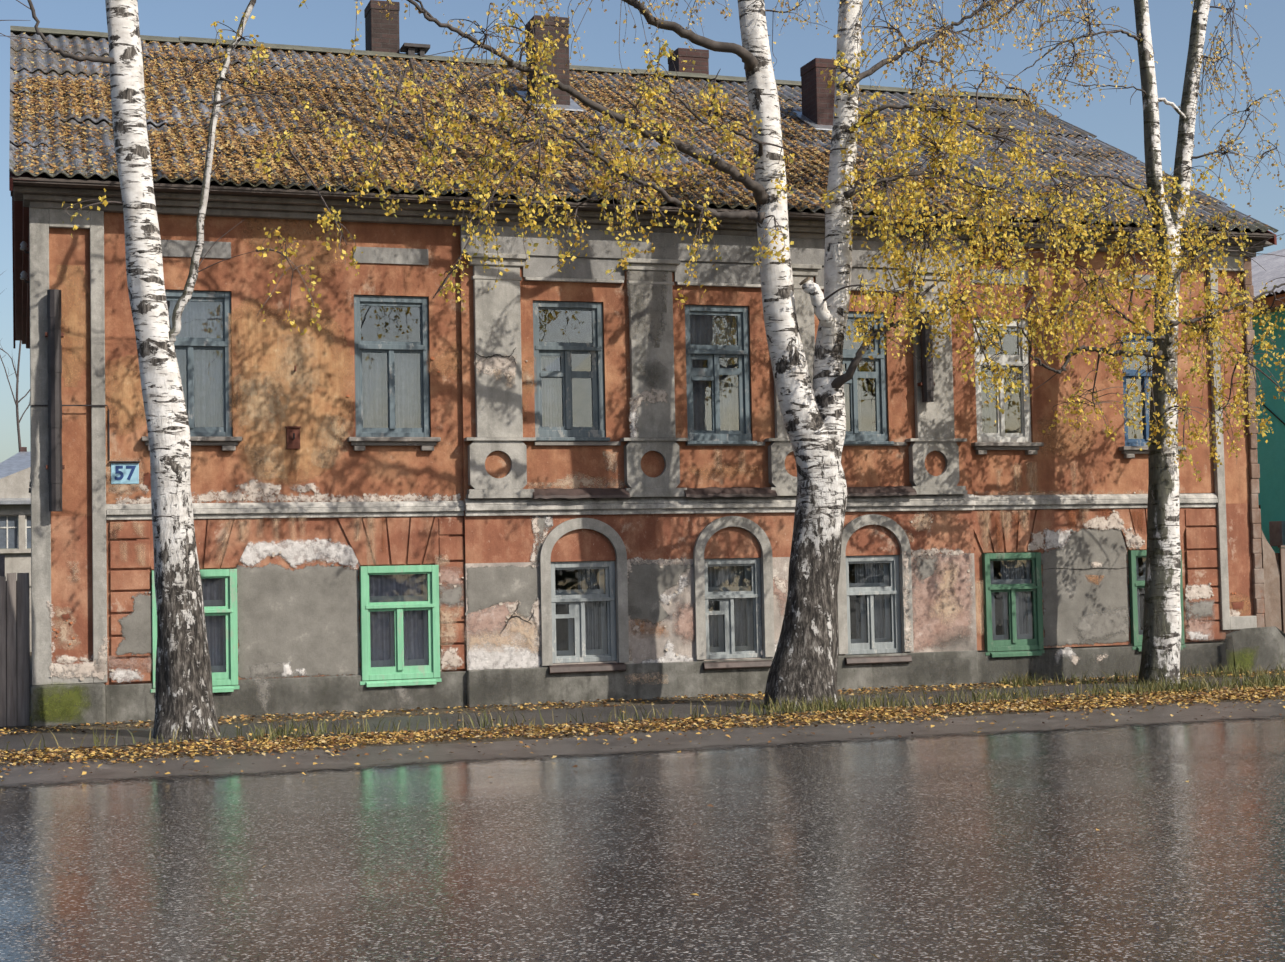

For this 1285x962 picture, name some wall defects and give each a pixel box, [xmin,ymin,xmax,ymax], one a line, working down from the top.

flaking render [107,460,151,504]
peeling [192,306,461,503]
flaking render [474,355,534,419]
spalling [1185,257,1265,641]
spalling [47,592,153,683]
spalling [234,538,361,679]
spalling [437,515,553,671]
crack [500,604,534,634]
spalling [627,557,700,663]
spalling [1028,510,1145,647]